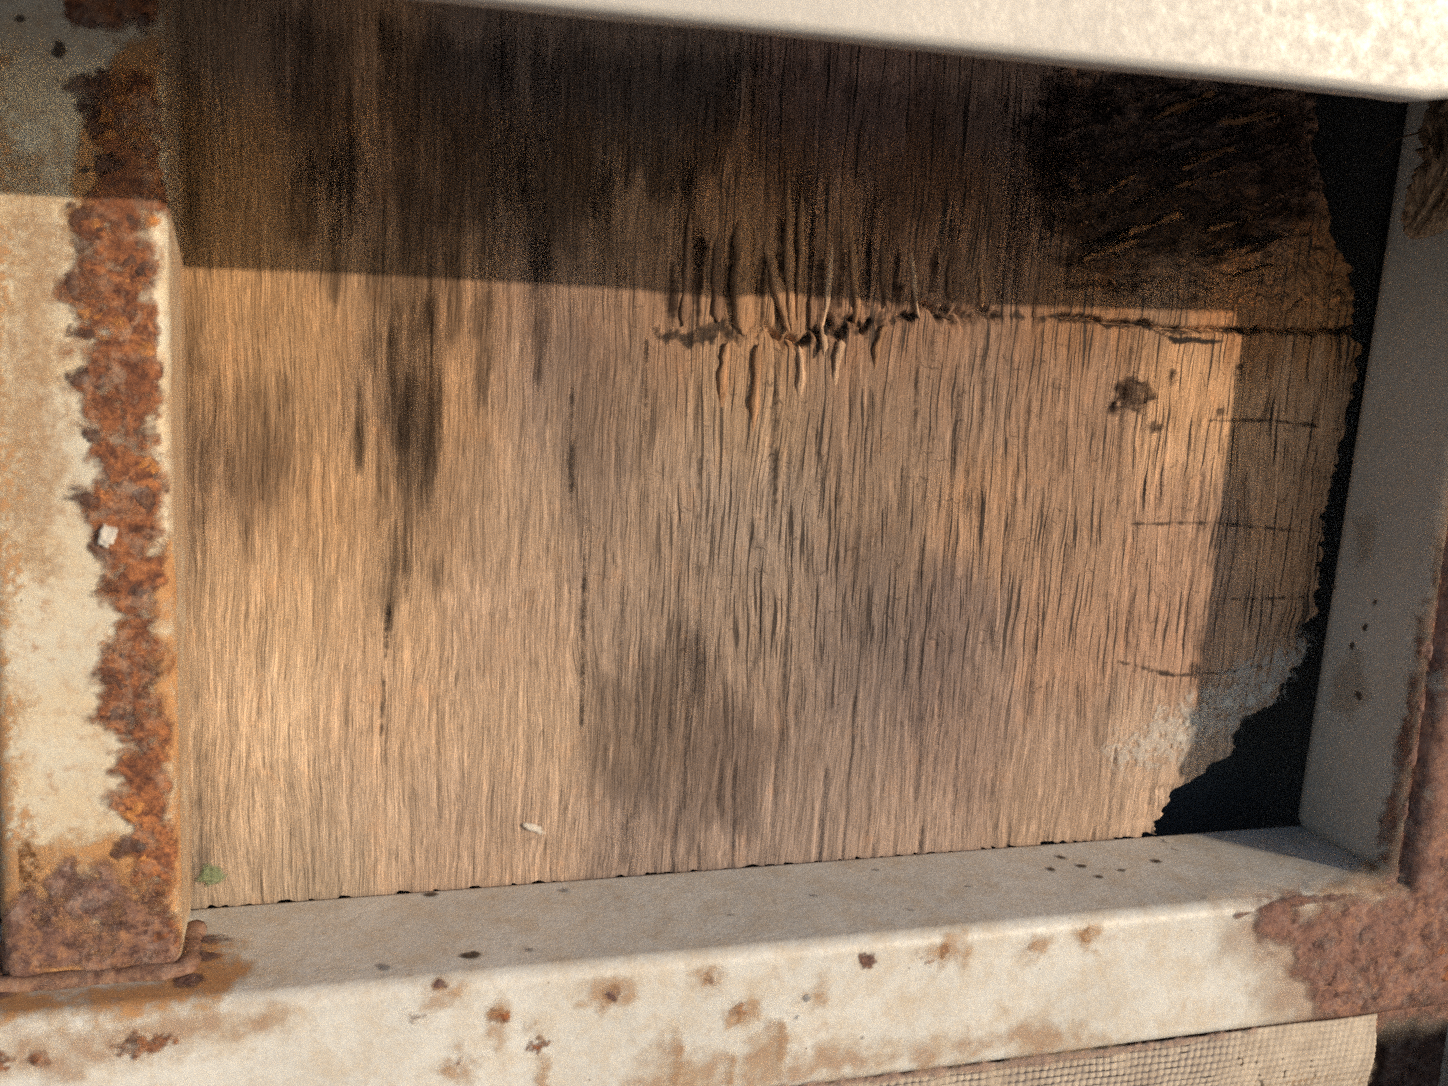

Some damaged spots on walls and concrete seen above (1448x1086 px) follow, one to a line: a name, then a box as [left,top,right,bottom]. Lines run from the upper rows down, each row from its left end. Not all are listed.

corrosion [0,0,254,1079]
crack [646,306,1351,360]
water stain [1198,229,1291,277]
corrosion [1232,507,1448,1027]